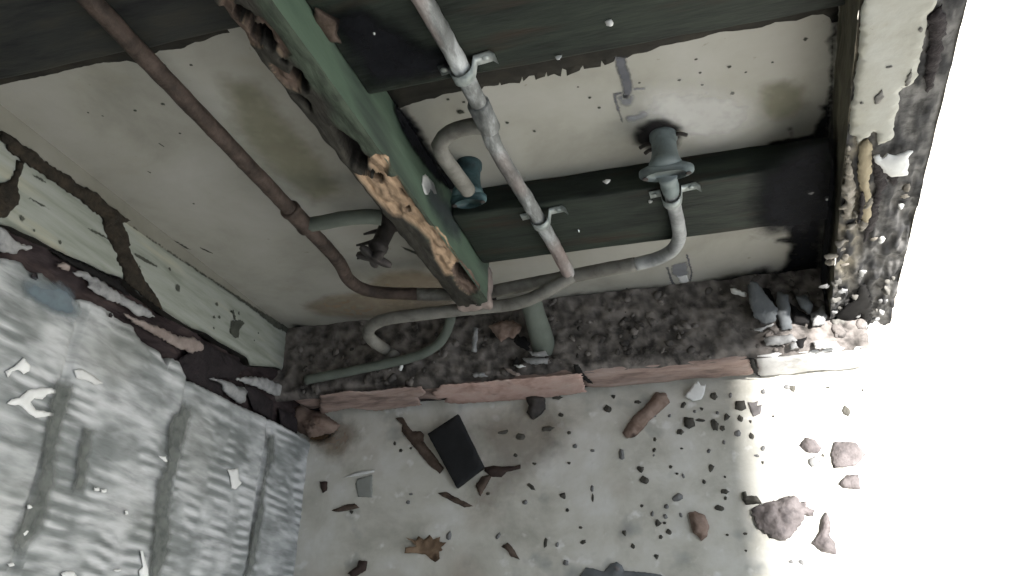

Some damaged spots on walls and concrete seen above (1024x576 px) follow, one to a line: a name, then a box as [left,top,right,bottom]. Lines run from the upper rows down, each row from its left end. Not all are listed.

peeling [476,6,839,89]
peeling [387,78,462,108]
peeling [819,0,948,325]
peeling [0,227,32,254]
peeling [57,262,204,354]
peeling [5,357,31,377]
peeling [7,387,55,418]
peeling [74,369,102,385]
peeling [208,376,282,404]